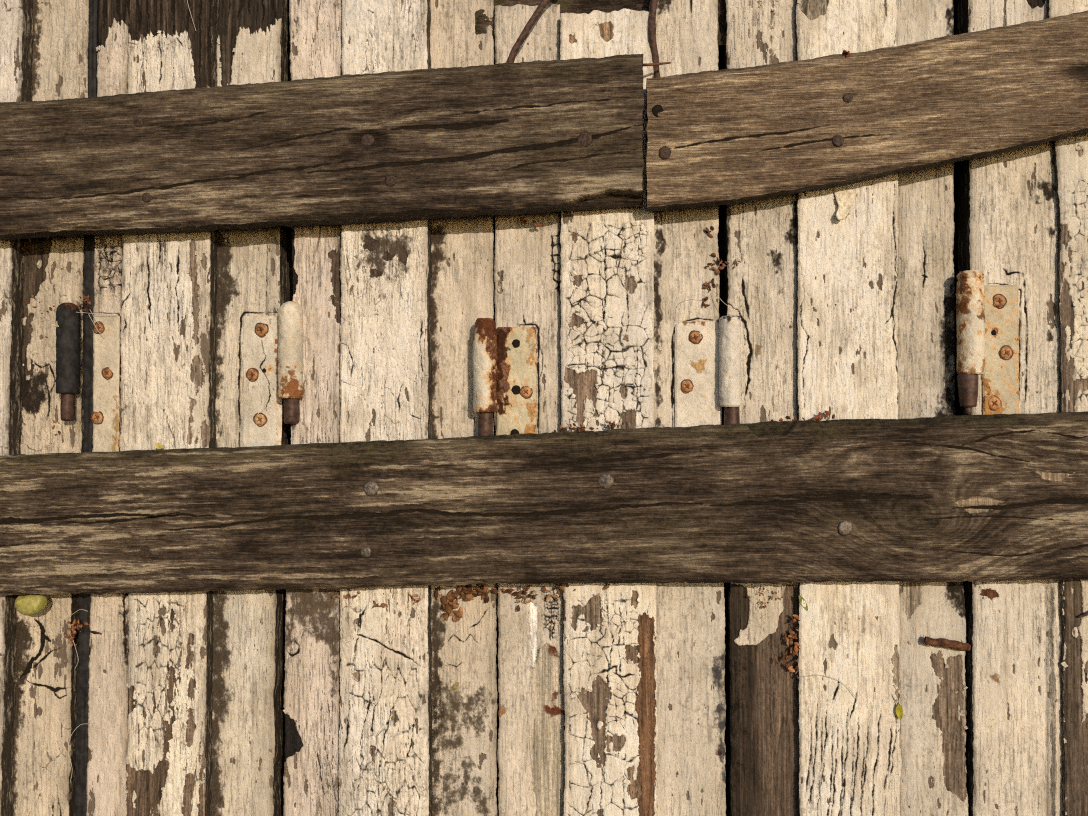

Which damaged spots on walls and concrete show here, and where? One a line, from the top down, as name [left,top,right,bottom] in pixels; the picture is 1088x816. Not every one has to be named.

crack [0,99,885,199]
corrosion [273,339,303,398]
corrosion [476,318,510,415]
crack [519,223,753,434]
corrosion [956,288,985,319]
corrosion [956,355,1007,415]
crack [988,268,1028,401]
peeling [124,633,206,816]
crack [317,610,422,816]
peeling [528,590,657,816]
peeling [730,583,798,816]
peeling [930,650,968,801]